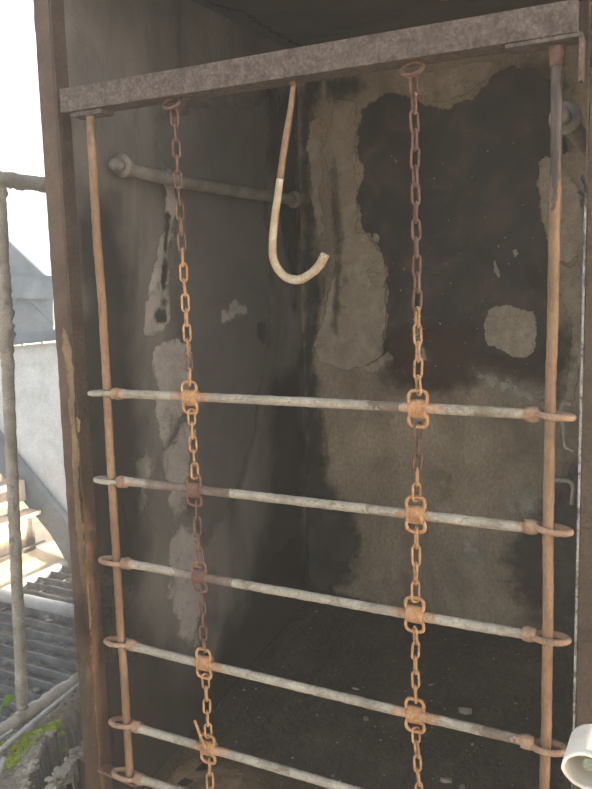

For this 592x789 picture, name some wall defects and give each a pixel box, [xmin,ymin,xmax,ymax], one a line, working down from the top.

peeling [143,185,177,335]
peeling [306,65,551,389]
peeling [556,168,584,401]
peeling [152,339,192,449]
leakage [472,368,544,405]
leakage [503,532,543,624]
leakage [508,486,543,522]
leakage [553,459,578,644]